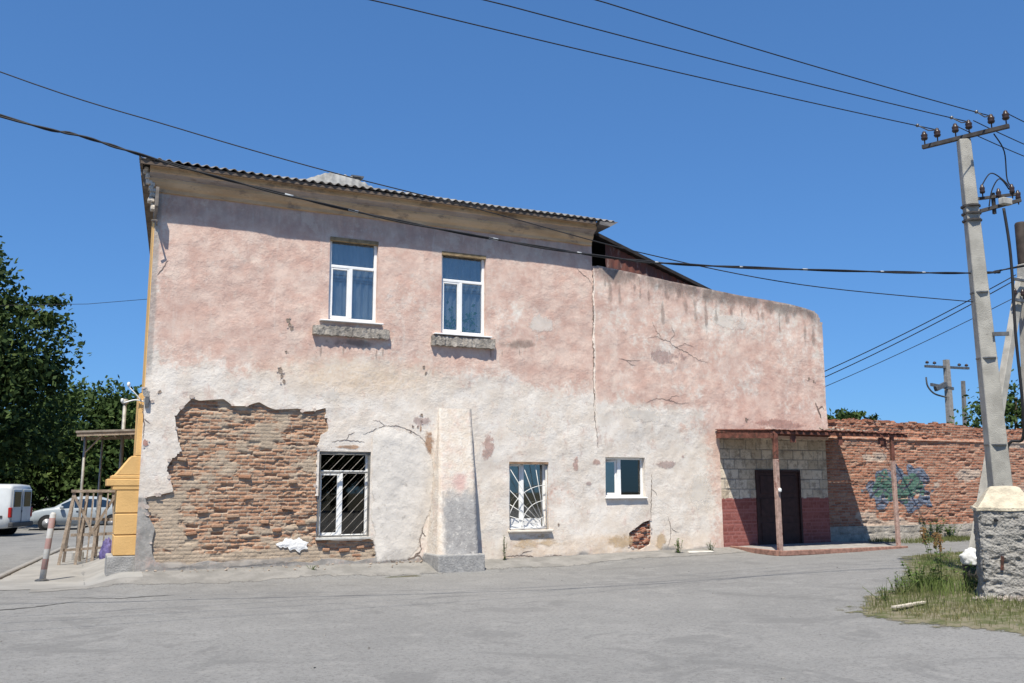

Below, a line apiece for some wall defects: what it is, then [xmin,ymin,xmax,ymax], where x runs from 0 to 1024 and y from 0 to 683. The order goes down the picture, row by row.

crack [583,268,598,445]
flaking render [144,395,375,565]
spalling [628,518,652,550]